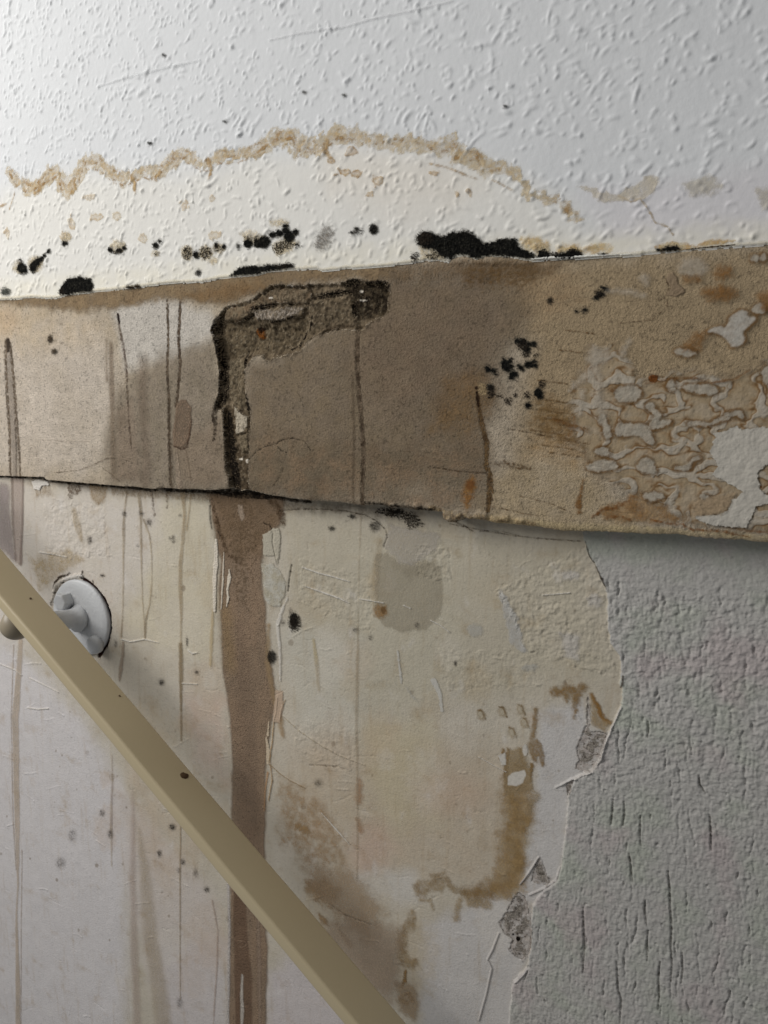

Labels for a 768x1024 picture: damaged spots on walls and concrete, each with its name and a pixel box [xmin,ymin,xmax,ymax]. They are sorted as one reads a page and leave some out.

leakage [6,124,582,221]
peeling [32,479,49,491]
crack [0,458,384,532]
peeling [209,539,231,666]
leakage [0,219,611,859]
peeling [262,528,287,808]
peeling [576,698,607,772]
leakage [11,639,22,1024]
leakage [213,883,267,1024]
leakage [282,705,544,1019]
peeling [499,893,532,960]
peeling [532,859,549,885]